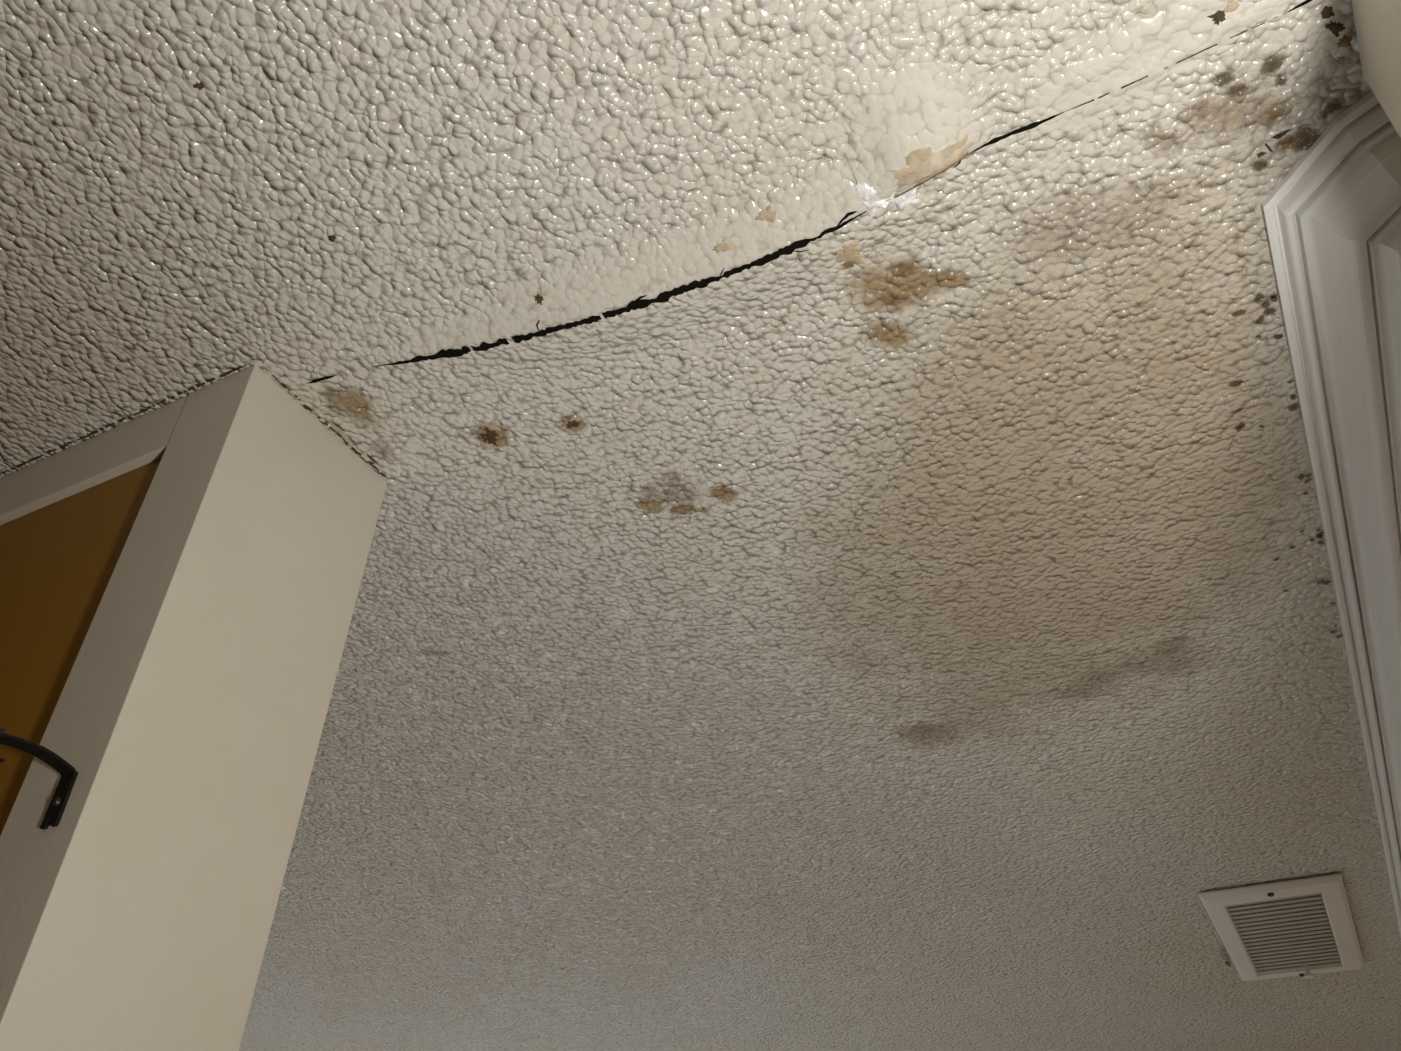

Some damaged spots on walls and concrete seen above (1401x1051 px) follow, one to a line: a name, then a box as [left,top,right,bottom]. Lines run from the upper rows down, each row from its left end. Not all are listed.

crack [953,0,1312,168]
water stain [1192,56,1287,131]
water stain [1277,101,1343,151]
water stain [1253,161,1267,171]
crack [375,211,867,367]
water stain [856,263,971,346]
water stain [1232,294,1284,339]
water stain [636,473,737,515]
water stain [870,311,1264,647]
water stain [1274,529,1324,561]